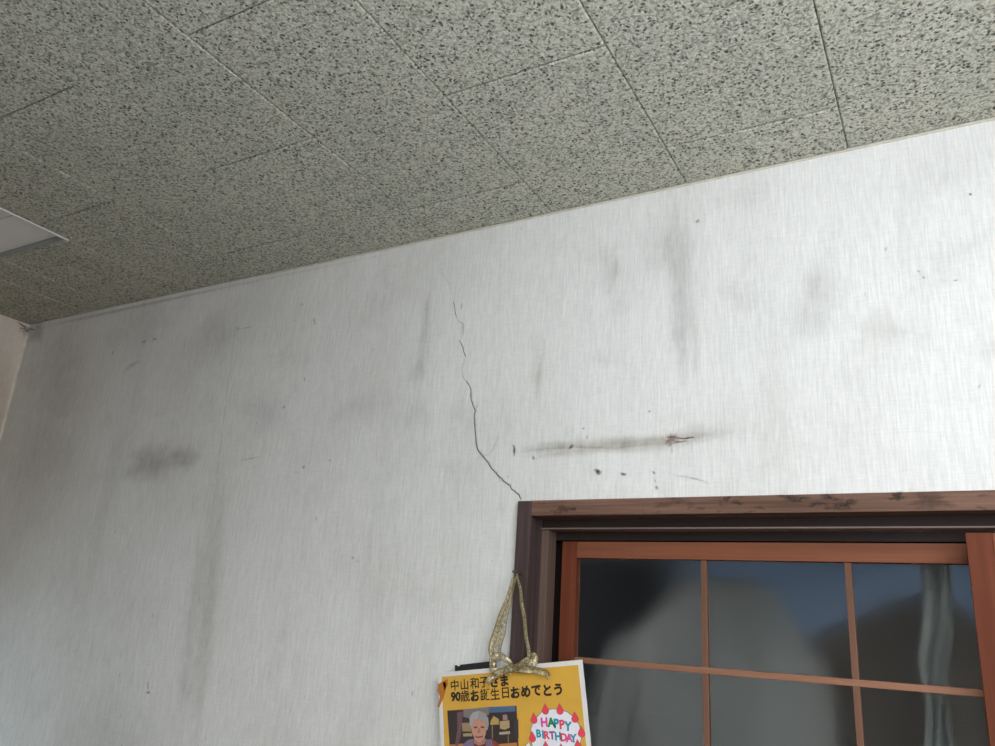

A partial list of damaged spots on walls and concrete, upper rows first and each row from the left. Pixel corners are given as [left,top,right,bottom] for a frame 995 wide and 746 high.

crack [466,381,521,499]